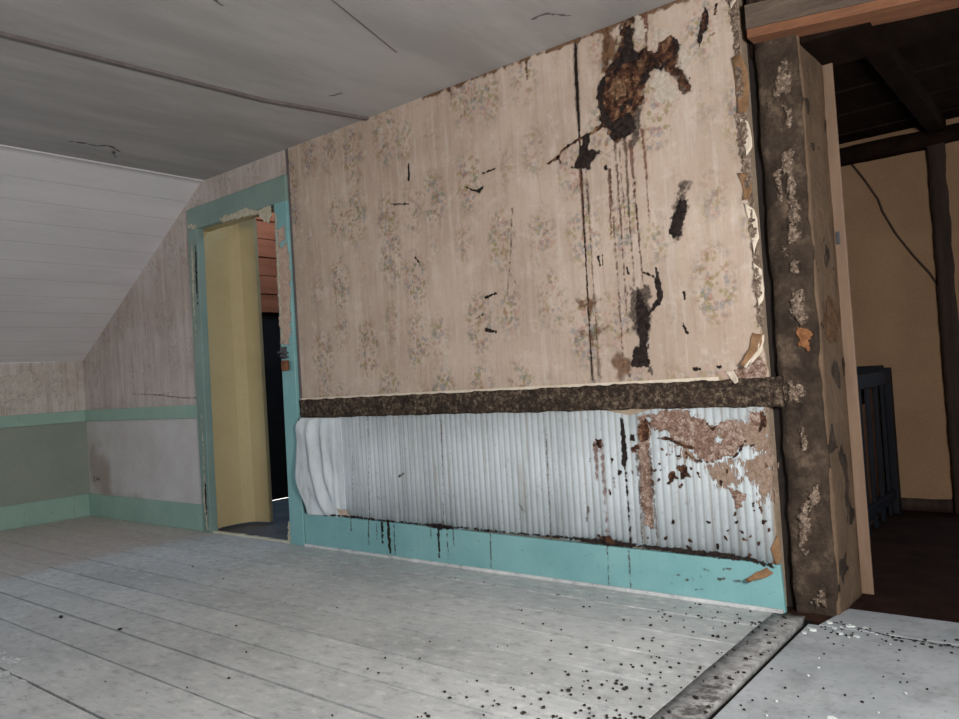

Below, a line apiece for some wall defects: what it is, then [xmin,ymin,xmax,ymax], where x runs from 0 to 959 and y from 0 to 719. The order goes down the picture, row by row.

water stain [423,0,692,355]
peeling [796,327,813,351]